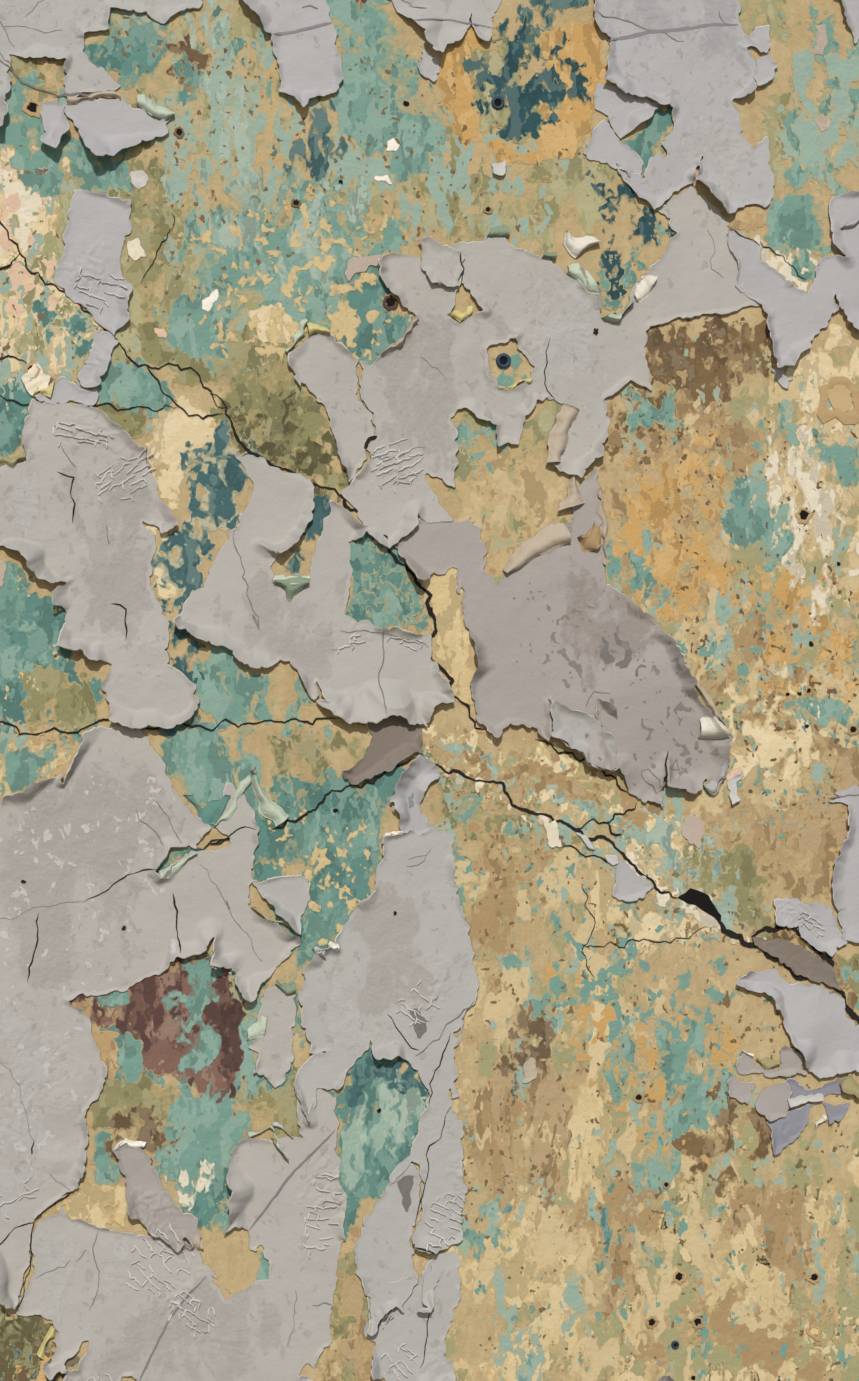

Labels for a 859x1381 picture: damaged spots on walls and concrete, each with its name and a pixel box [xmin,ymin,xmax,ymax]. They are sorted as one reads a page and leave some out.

peeling [841,0,859,46]
crack [544,339,555,399]
crack [0,739,859,1023]
flaking render [475,1124,492,1151]
flaking render [689,1097,723,1136]